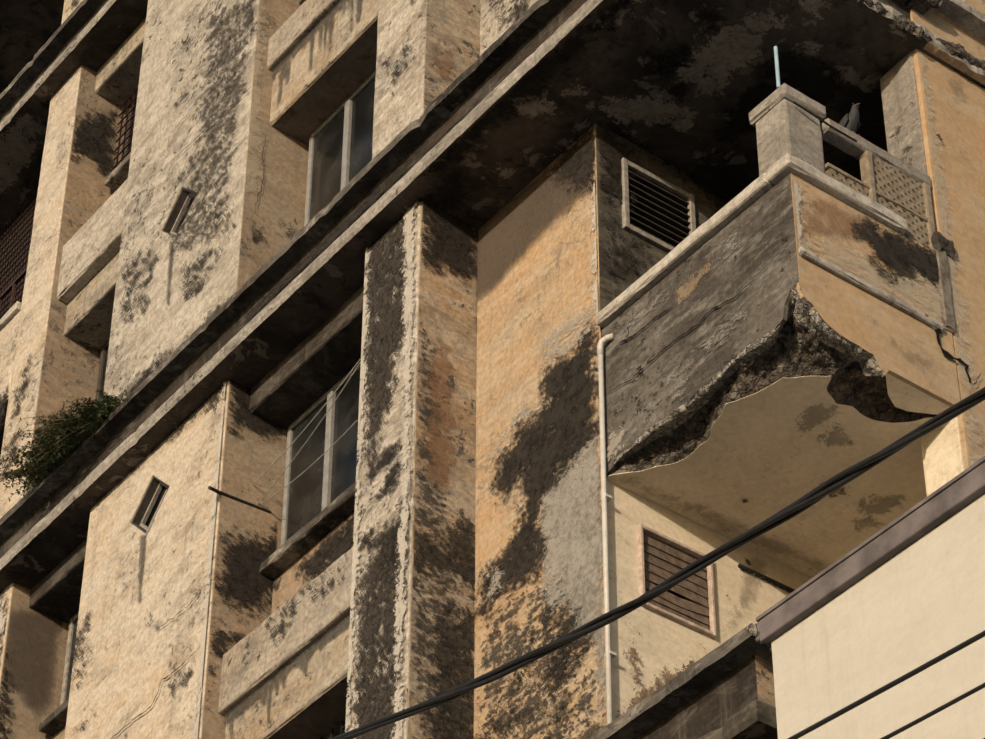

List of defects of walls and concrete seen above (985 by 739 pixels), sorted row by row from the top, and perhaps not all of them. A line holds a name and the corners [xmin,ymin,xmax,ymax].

spalling [856,0,985,70]
peeling [511,76,588,119]
peeling [595,0,835,145]
damp [117,0,274,335]
mould [850,215,940,288]
damp [194,0,635,739]
crack [935,329,981,385]
spalling [536,282,936,614]
damp [847,494,905,531]
damp [164,665,193,700]